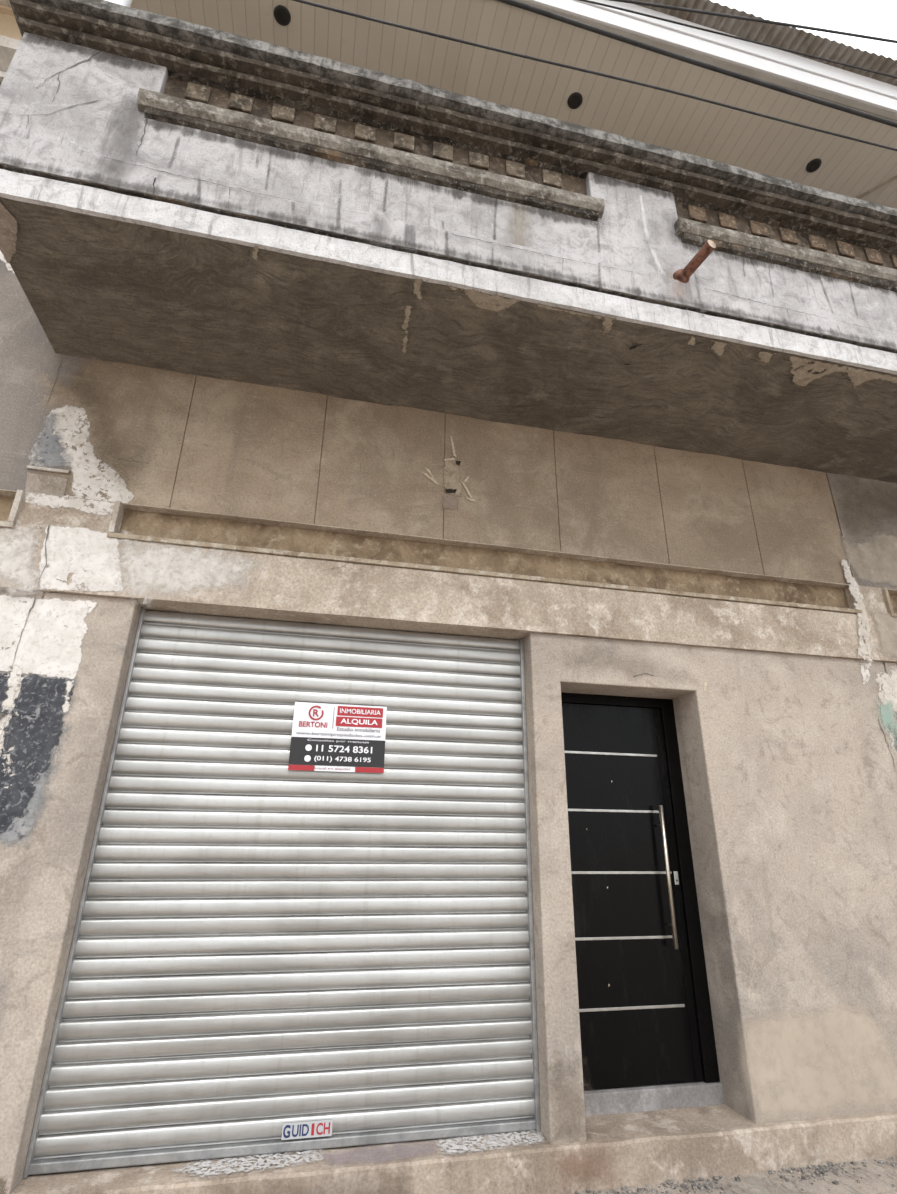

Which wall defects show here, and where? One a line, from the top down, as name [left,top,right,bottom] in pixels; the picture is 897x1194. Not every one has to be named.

spalling [0,202,18,274]
spalling [757,350,897,388]
peeling [24,404,135,516]
peeling [0,525,253,843]
spalling [841,533,897,755]